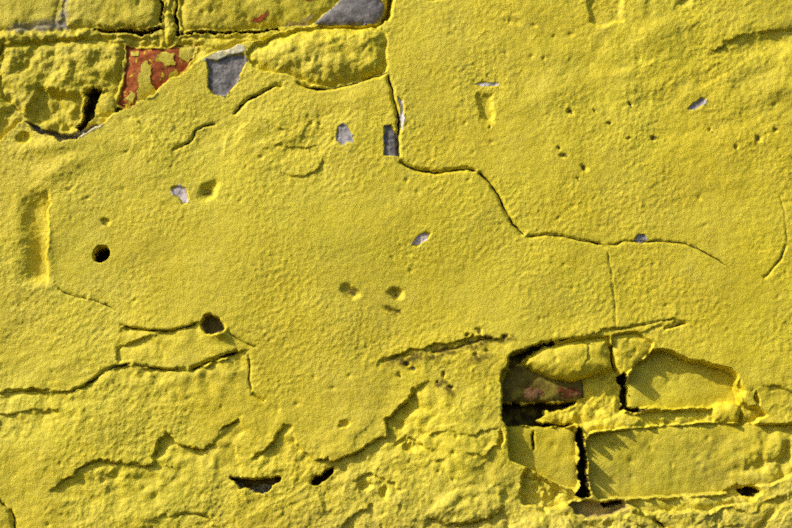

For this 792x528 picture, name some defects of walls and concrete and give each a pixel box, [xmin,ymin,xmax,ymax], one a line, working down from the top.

spalling [377,0,391,26]
spalling [0,0,340,142]
peeling [336,123,354,145]
peeling [383,96,405,156]
crack [232,72,728,375]
crack [70,332,266,403]
spalling [0,388,86,420]
spalling [54,325,792,518]